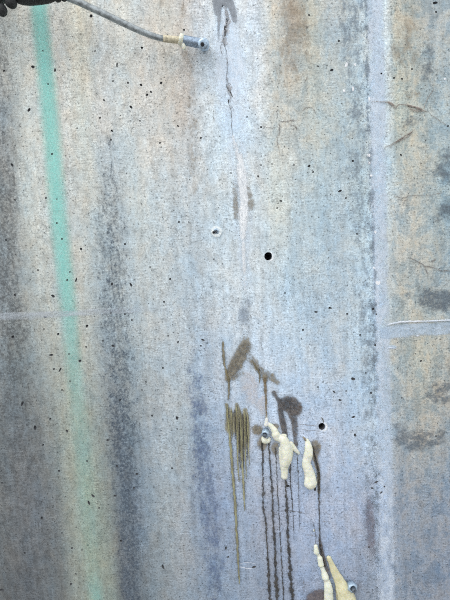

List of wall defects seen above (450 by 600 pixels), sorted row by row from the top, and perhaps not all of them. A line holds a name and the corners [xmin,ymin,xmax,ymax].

crack [220,5,234,135]
damp [222,337,302,600]
damp [311,440,331,578]
damp [307,589,324,600]